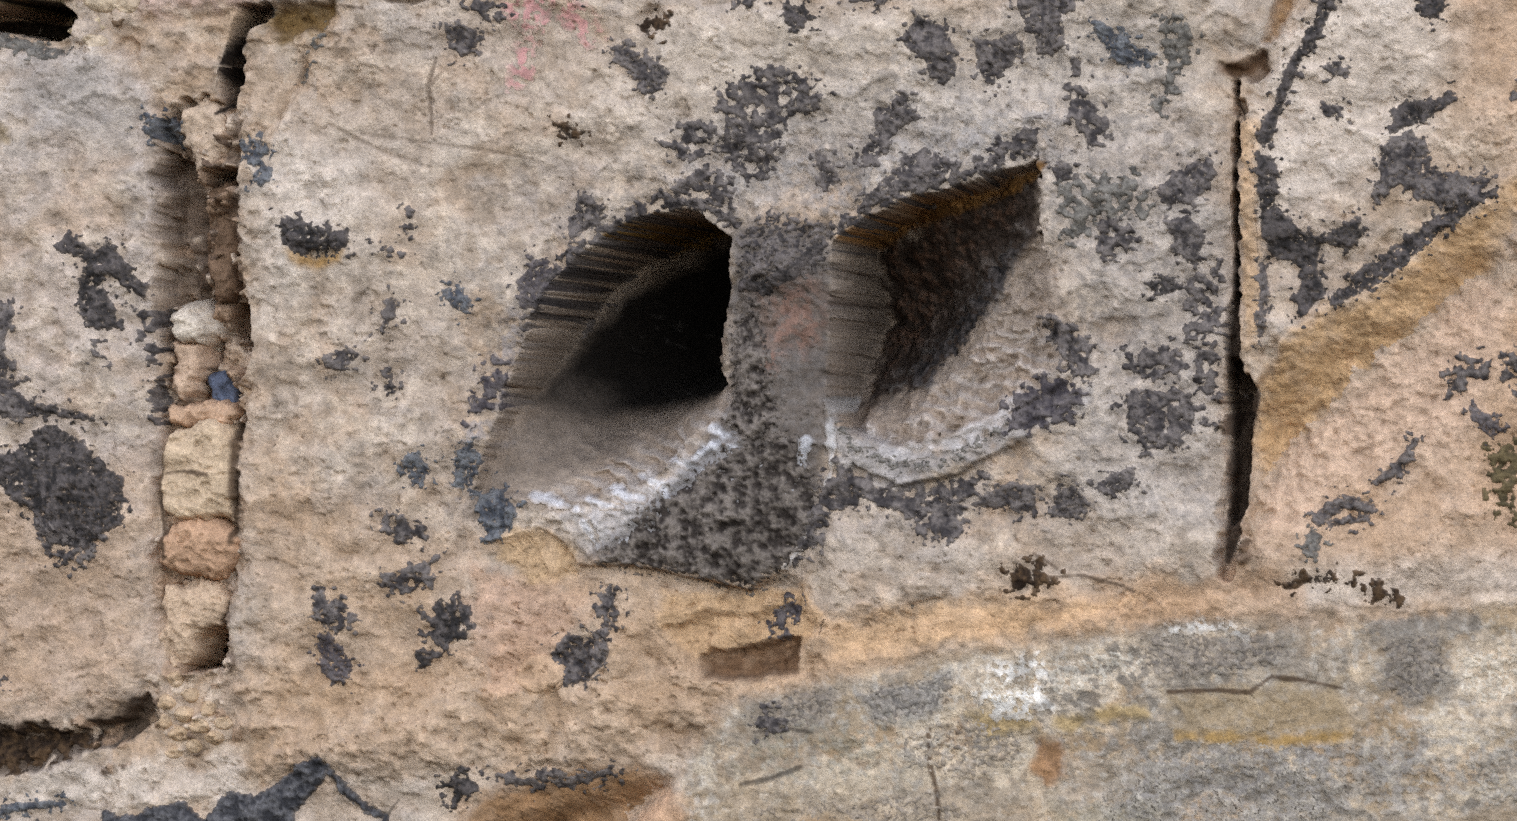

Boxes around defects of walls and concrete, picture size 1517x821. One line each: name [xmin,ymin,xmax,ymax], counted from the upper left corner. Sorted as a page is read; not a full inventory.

crack [213,4,276,116]
crack [1222,80,1262,566]